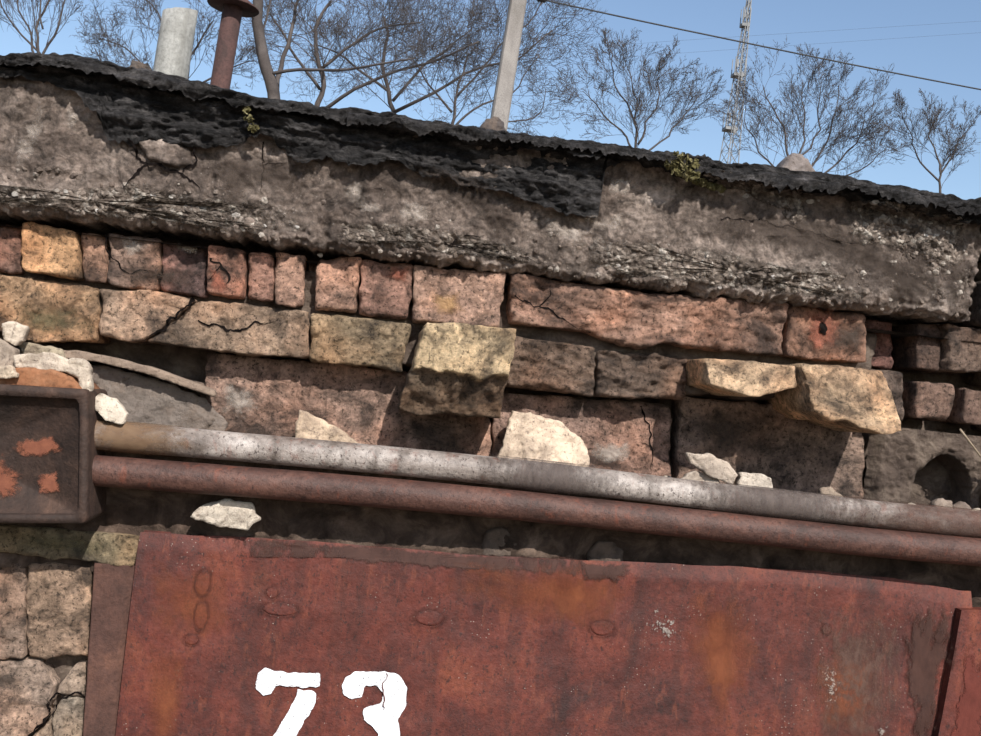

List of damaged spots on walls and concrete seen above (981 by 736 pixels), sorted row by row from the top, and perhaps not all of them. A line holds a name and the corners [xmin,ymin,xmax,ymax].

crack [123,138,200,191]
crack [143,258,279,341]
crack [640,406,654,472]
rust [896,505,981,538]
crack [28,692,84,736]